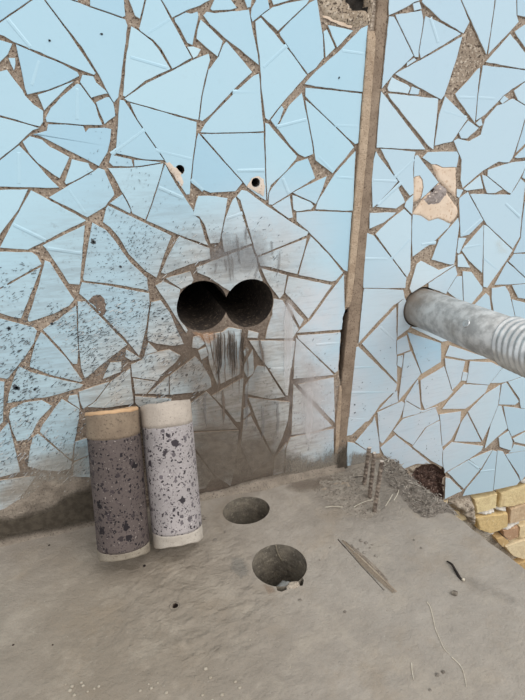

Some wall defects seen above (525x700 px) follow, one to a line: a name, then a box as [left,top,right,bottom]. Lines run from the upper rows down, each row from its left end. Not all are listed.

flaking render [317,0,373,28]
spalling [412,164,458,223]
leakage [212,330,249,422]
spalling [407,463,445,500]